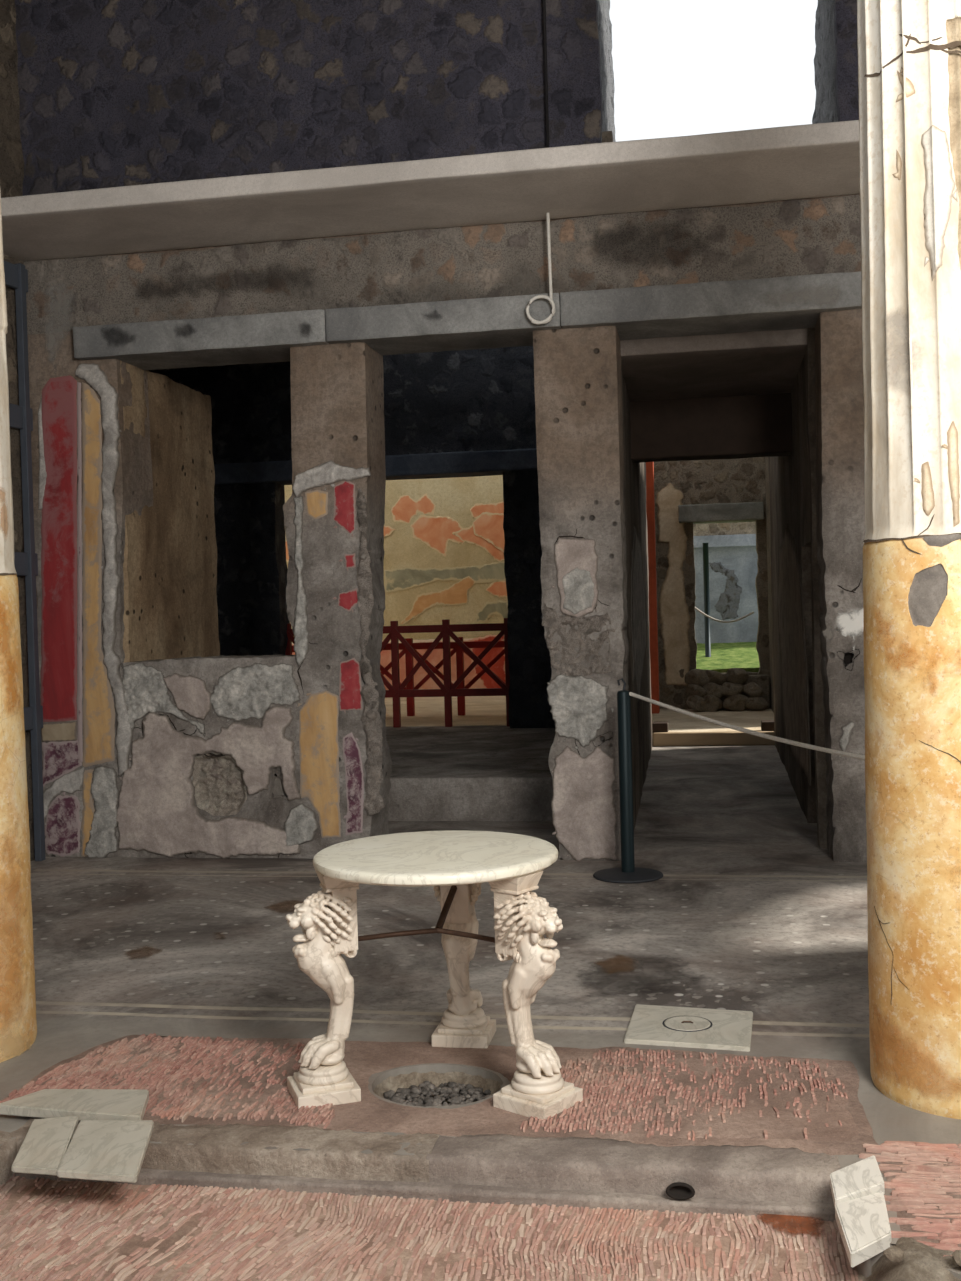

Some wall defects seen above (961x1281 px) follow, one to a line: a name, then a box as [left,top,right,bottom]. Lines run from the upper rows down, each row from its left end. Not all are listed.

crack [864,33,961,77]
peeling [921,18,961,281]
peeling [106,662,301,859]